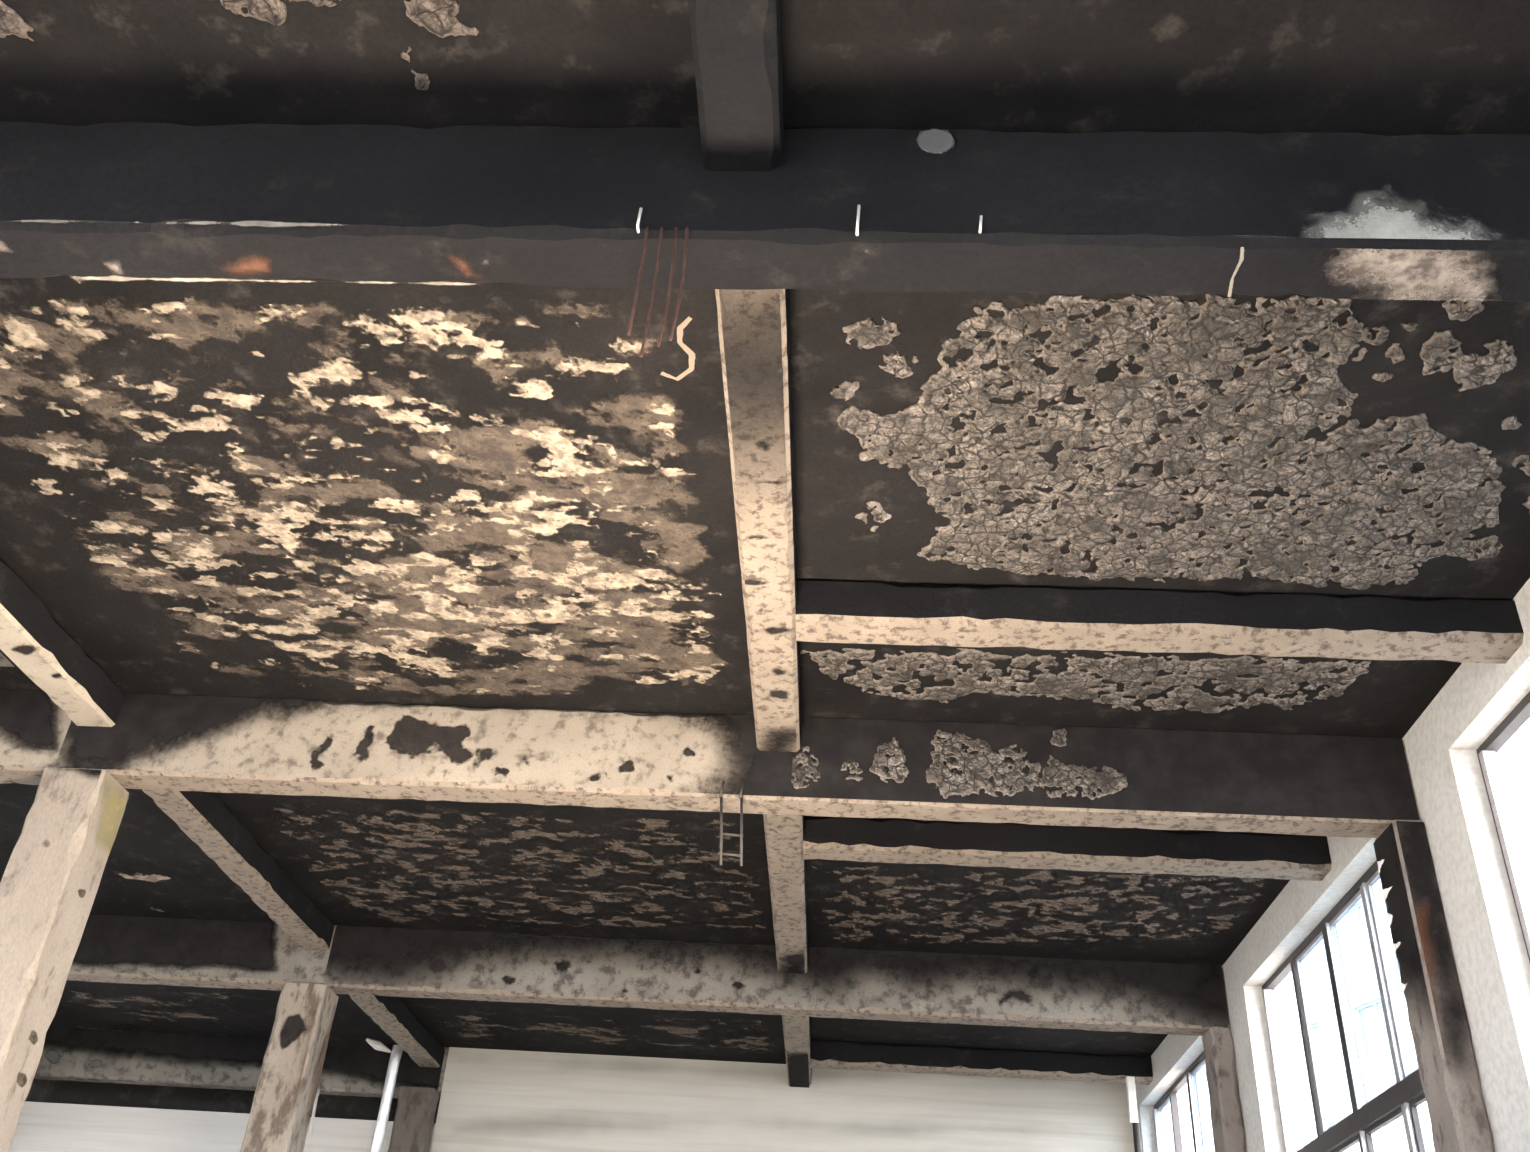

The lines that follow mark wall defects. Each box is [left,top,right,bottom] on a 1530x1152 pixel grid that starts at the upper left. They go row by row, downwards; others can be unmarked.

flaking render [0,0,34,41]
flaking render [220,0,341,26]
flaking render [404,0,479,38]
flaking render [400,47,430,90]
flaking render [830,197,1530,590]
flaking render [0,275,728,697]
flaking render [800,648,1371,713]
flaking render [791,745,820,789]
flaking render [841,728,1128,800]
flaking render [275,808,765,930]
flaking render [810,866,1268,944]